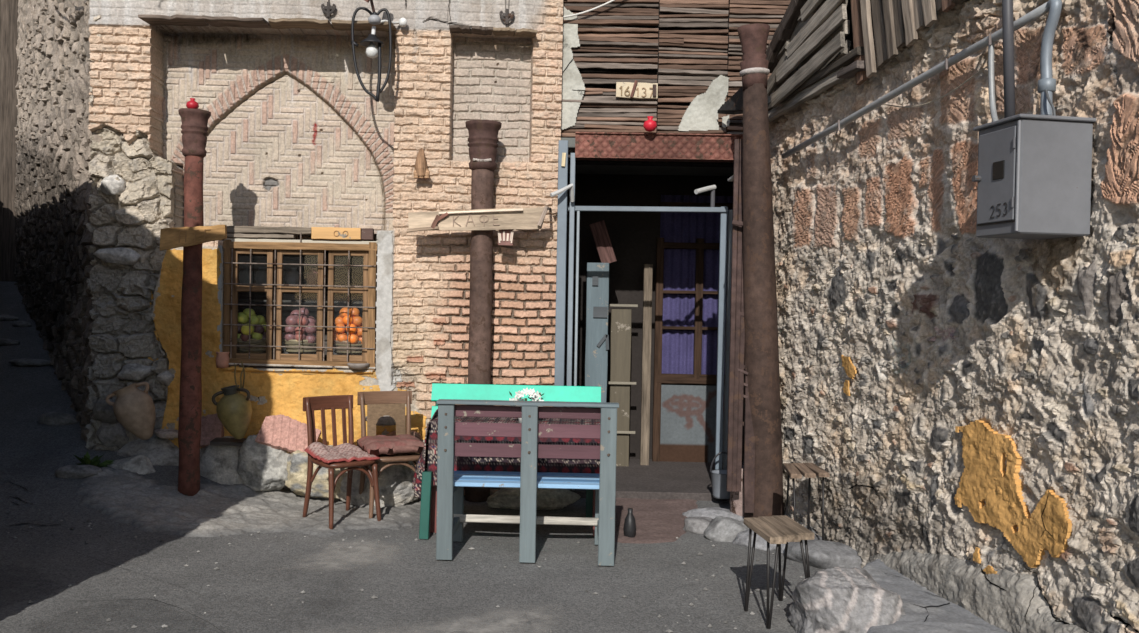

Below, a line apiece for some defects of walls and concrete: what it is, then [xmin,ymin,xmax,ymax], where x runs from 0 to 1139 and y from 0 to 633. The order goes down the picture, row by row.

flaking render [561,5,585,130]
flaking render [677,75,730,131]
peeling [841,355,857,396]
peeling [954,420,1072,568]
peeling [973,547,999,575]
crack [981,565,1075,625]
crack [1110,612,1139,633]